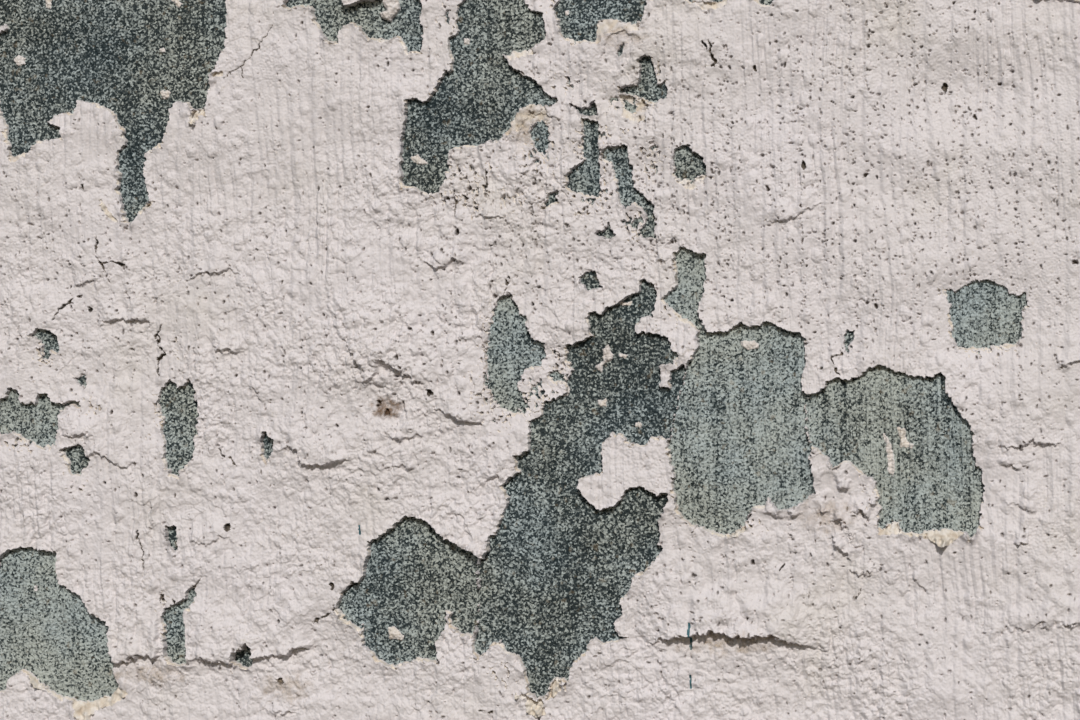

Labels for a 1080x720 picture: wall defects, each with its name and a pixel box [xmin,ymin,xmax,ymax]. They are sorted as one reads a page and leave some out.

peeling [281,0,424,56]
peeling [685,0,728,10]
peeling [0,0,230,224]
peeling [398,0,707,241]
peeling [942,279,1030,358]
peeling [0,373,102,476]
peeling [152,378,199,480]
peeling [329,246,985,719]
peeling [0,546,128,720]
peeling [160,587,197,667]